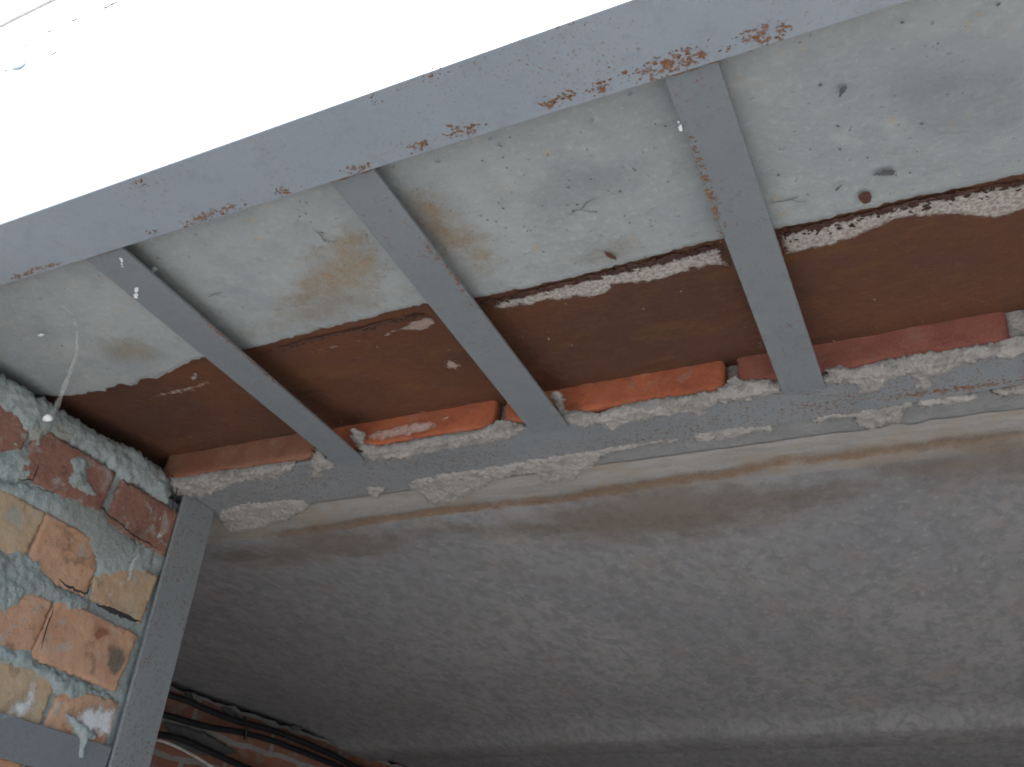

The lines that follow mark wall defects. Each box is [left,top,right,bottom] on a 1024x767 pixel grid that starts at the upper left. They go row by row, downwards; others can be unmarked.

rust [535,23,792,110]
rust [179,199,253,228]
rust [683,121,727,243]
flaking render [776,181,1024,252]
flaking render [481,242,728,308]
flaking render [387,318,434,334]
crack [96,501,160,551]
crack [41,579,93,649]